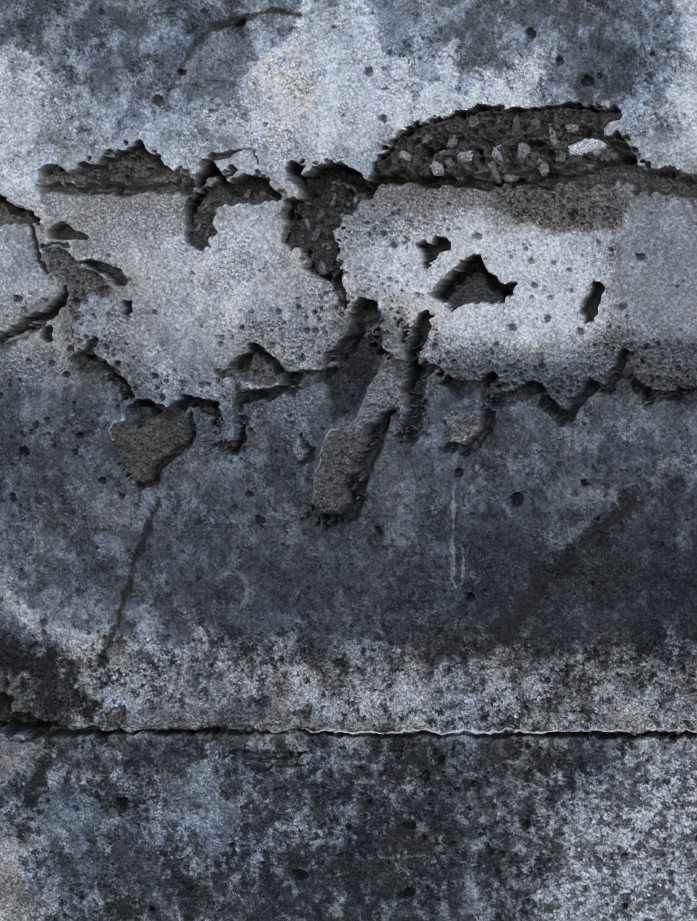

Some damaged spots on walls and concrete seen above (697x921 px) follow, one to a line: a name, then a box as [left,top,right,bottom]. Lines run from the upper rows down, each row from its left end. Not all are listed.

spalling [0,101,697,346]
flaking render [108,394,222,483]
crack [0,718,697,773]